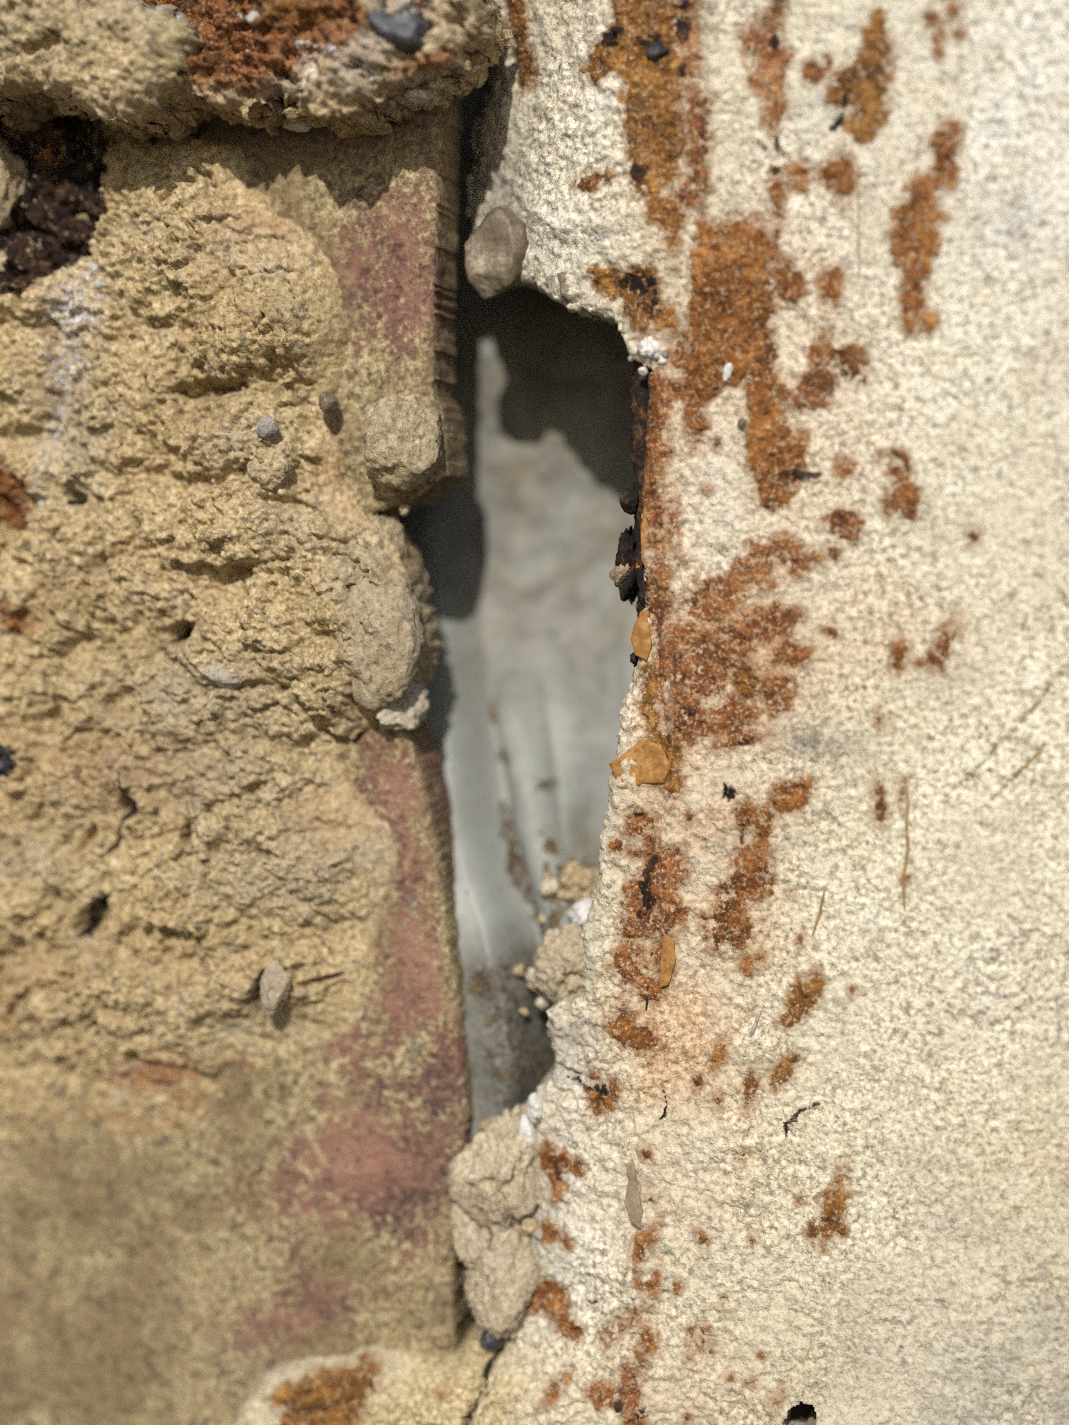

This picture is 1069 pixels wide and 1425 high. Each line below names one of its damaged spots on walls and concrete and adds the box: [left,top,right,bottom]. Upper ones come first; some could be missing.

rust [146,0,368,96]
rust [887,116,966,337]
peeling [0,263,27,294]
rust [572,0,896,1053]
rust [877,447,922,521]
rust [888,611,962,675]
rust [537,1139,585,1252]
peeling [622,1146,643,1230]
rust [795,1164,853,1253]
rust [528,1220,681,1425]
rust [269,1352,383,1425]
crack [463,1346,504,1425]